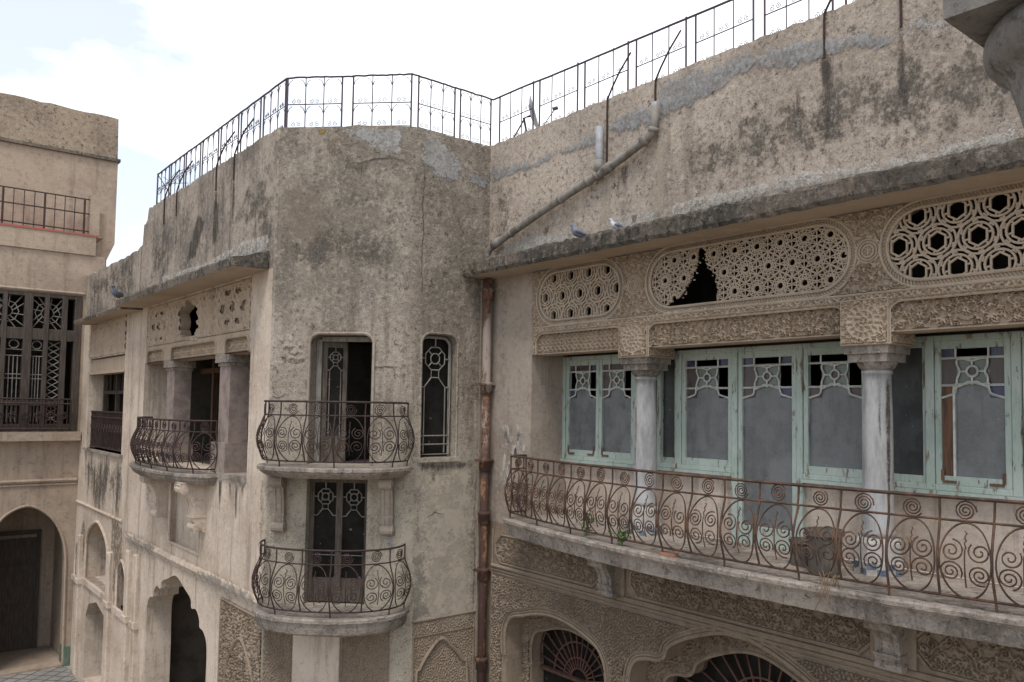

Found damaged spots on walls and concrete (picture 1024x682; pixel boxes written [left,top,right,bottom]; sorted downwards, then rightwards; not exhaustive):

damp [689,33,1012,188]
crack [346,157,427,286]
damp [85,457,121,508]